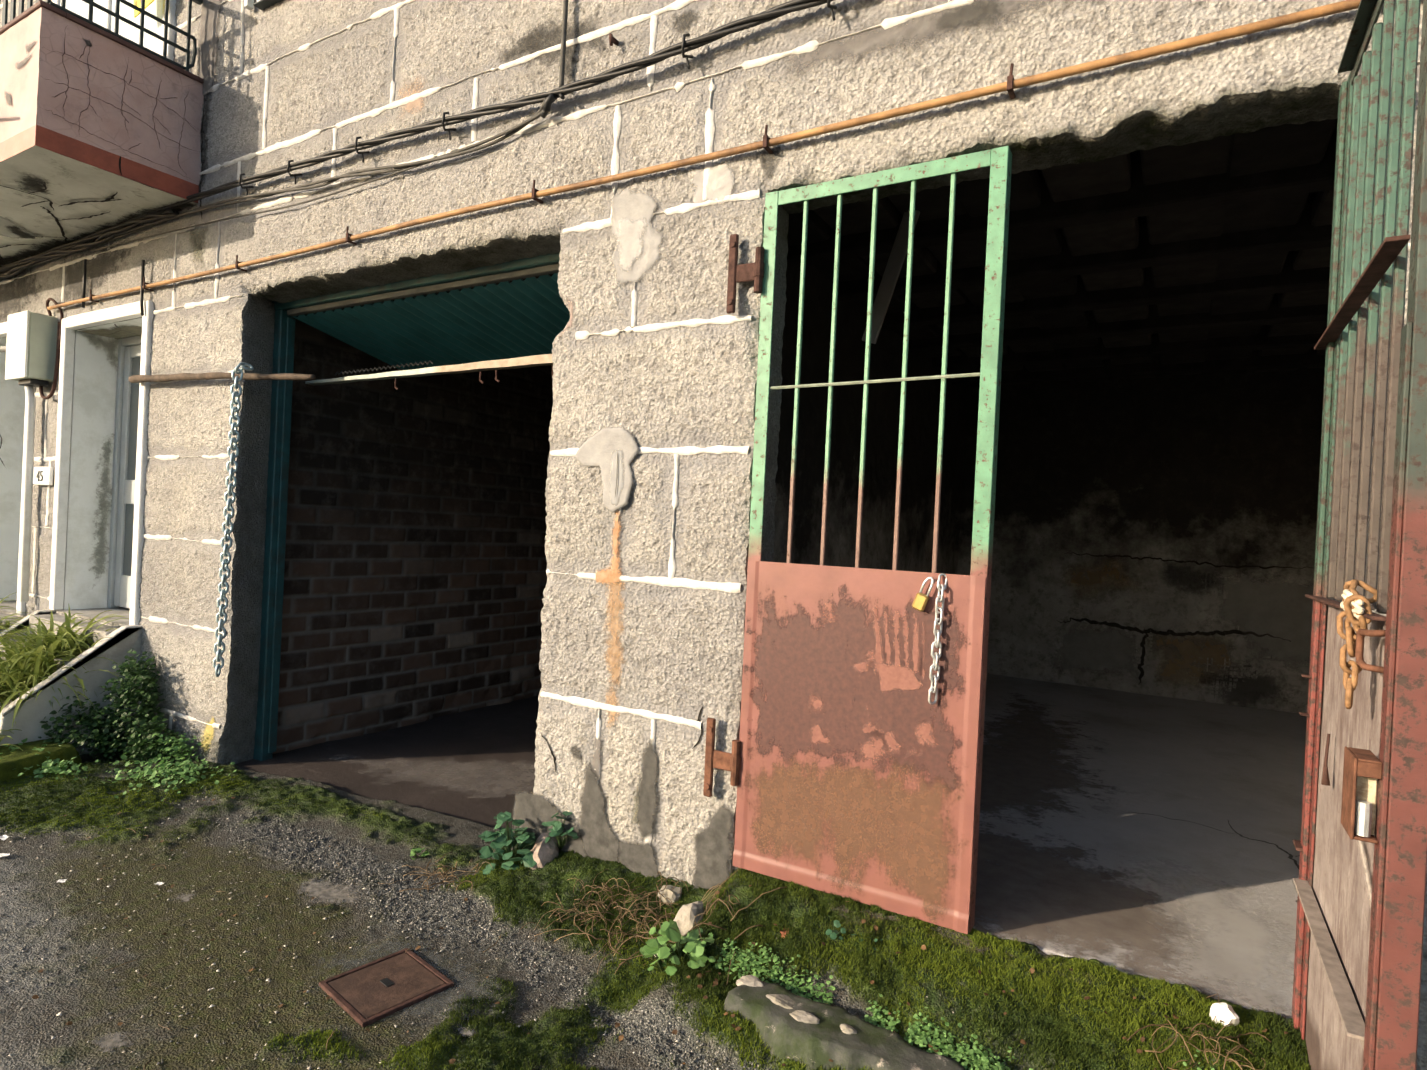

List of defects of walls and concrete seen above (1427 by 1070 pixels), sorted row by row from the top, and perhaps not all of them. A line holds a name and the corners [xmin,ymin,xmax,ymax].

crack [0,26,205,264]
corrosion [595,510,623,722]
crack [1058,617,1291,685]
water stain [332,738,659,878]
water stain [692,805,733,890]
crack [1133,812,1300,902]